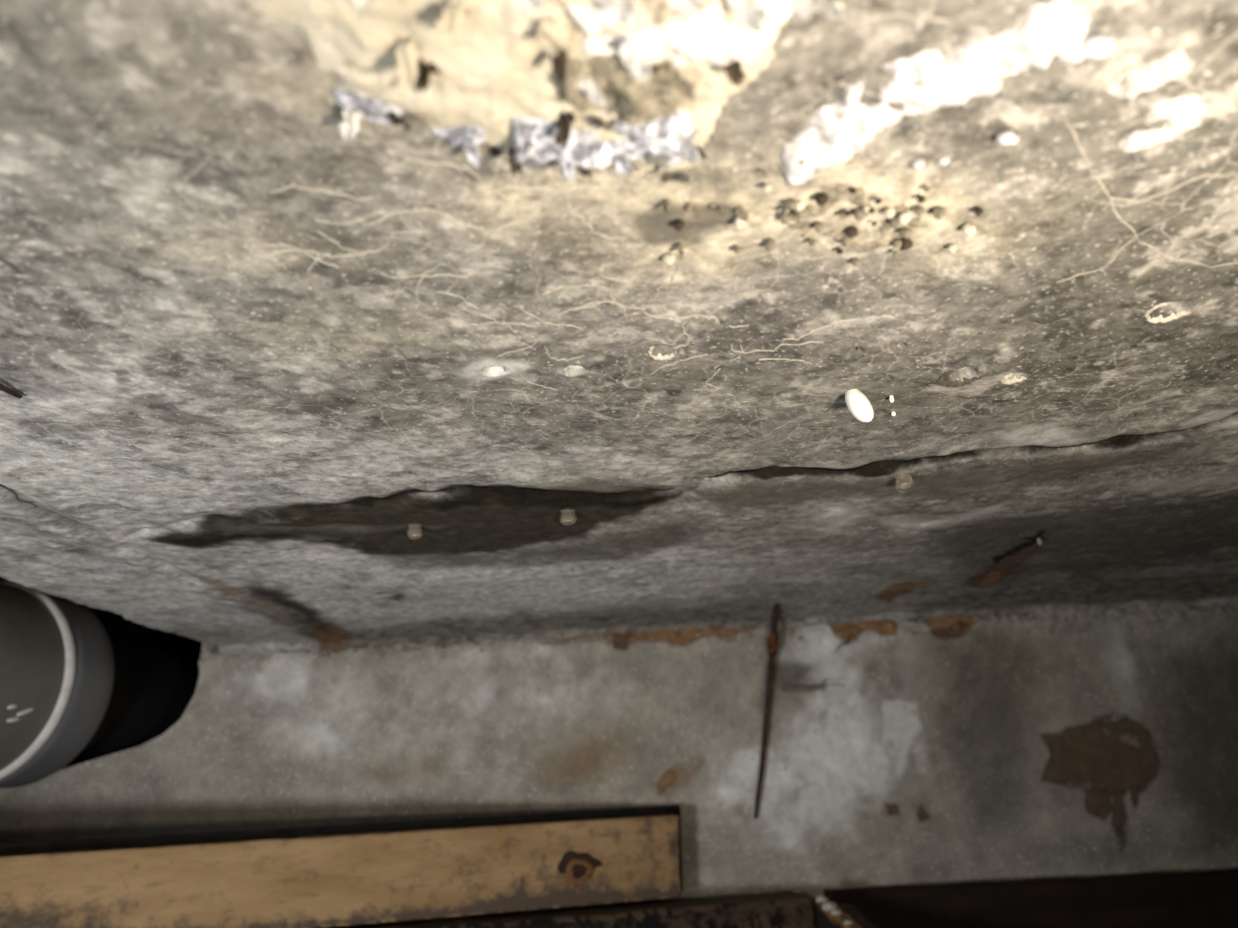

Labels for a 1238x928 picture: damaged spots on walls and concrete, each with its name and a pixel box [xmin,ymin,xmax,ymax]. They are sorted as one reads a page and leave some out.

peeling [246,0,844,183]
spalling [637,199,748,265]
spalling [780,182,947,267]
spalling [948,207,984,252]
rust [0,383,22,398]
crack [1023,425,1201,450]
crack [308,450,980,507]
water stain [150,482,688,566]
rust [543,627,750,649]
rust [829,619,897,649]
rust [927,615,975,639]
rust [1042,715,1160,851]